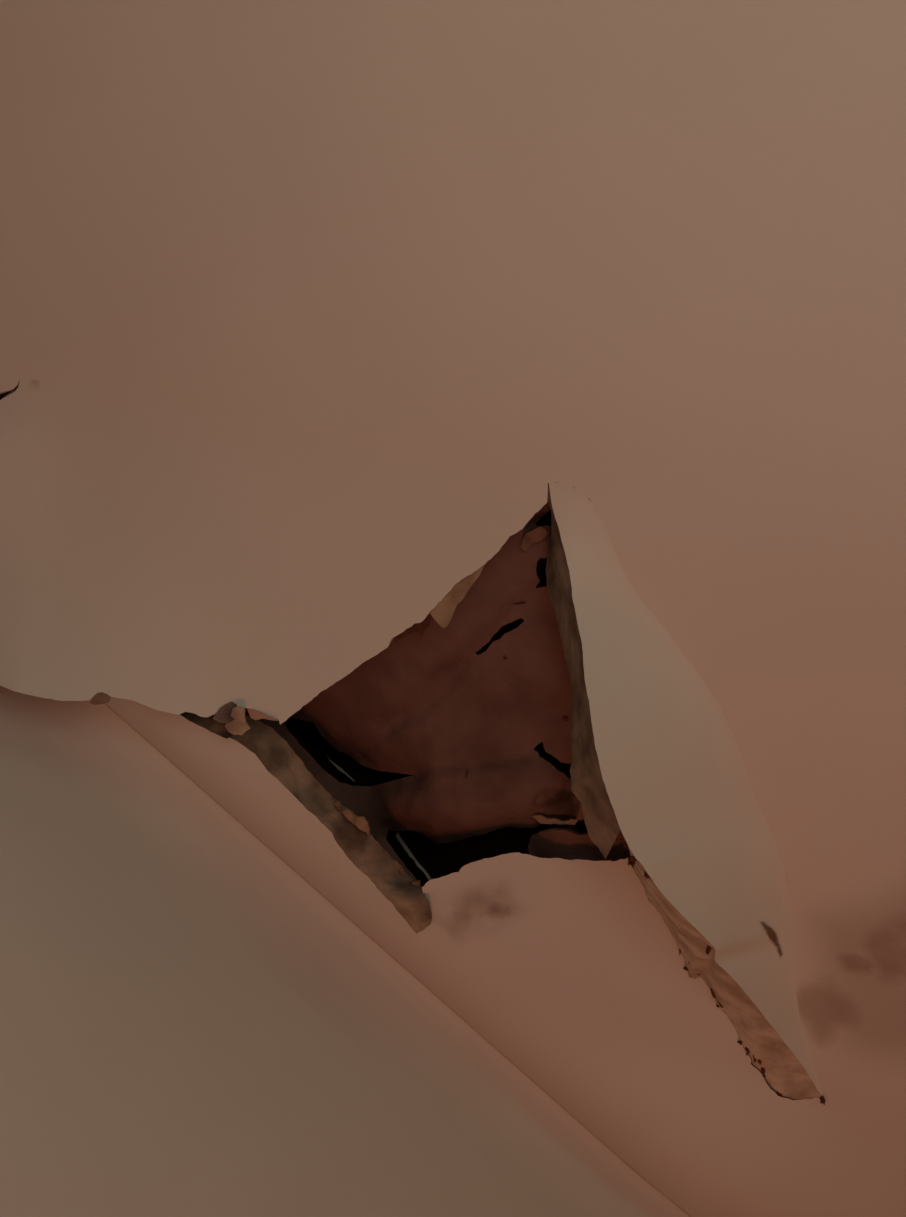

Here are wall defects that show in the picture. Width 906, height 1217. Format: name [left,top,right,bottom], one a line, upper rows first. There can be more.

crack [0,379,20,400]
spalling [545,488,620,859]
spalling [180,712,432,934]